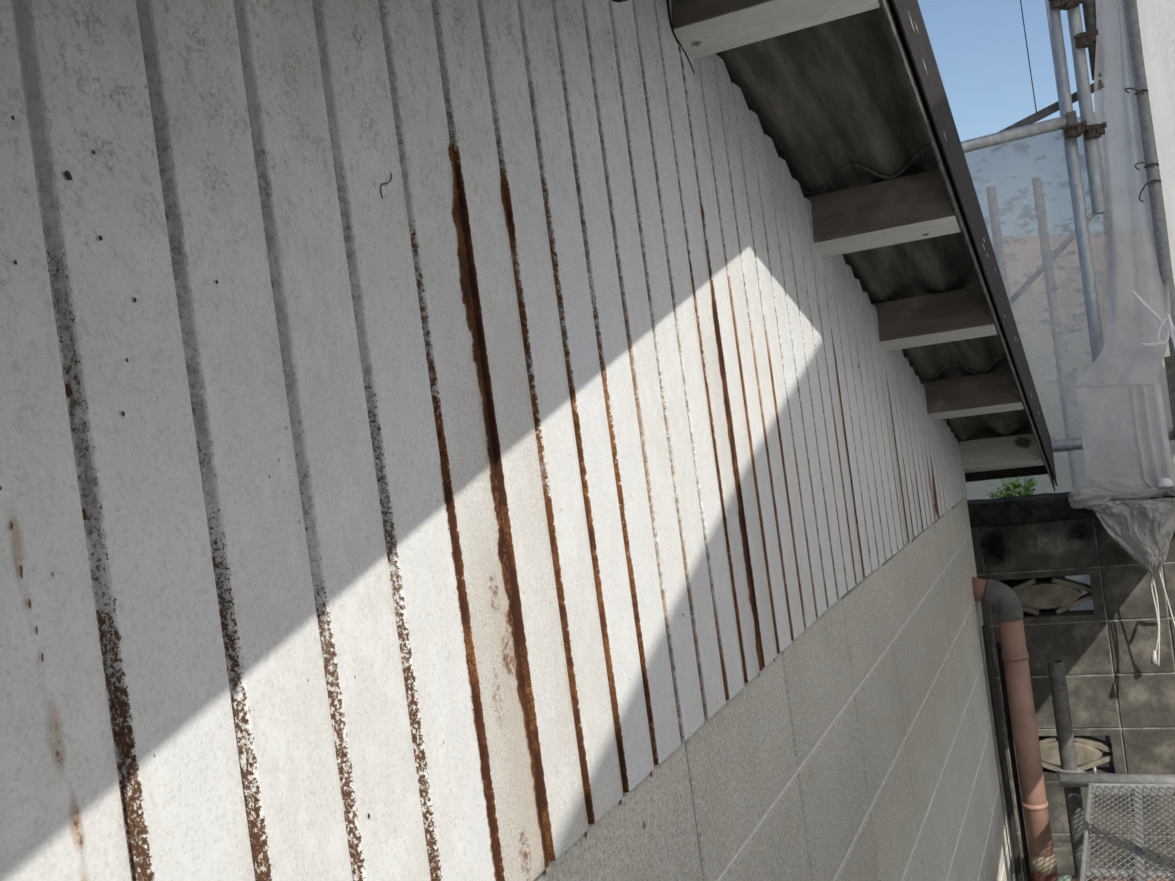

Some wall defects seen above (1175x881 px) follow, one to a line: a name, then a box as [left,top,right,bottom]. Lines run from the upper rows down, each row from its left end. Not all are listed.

corrosion [46,237,155,881]
corrosion [192,386,273,881]
corrosion [305,526,366,881]
corrosion [408,141,555,881]
corrosion [499,161,595,838]
corrosion [580,210,659,778]
corrosion [713,605,730,700]
corrosion [685,204,946,685]